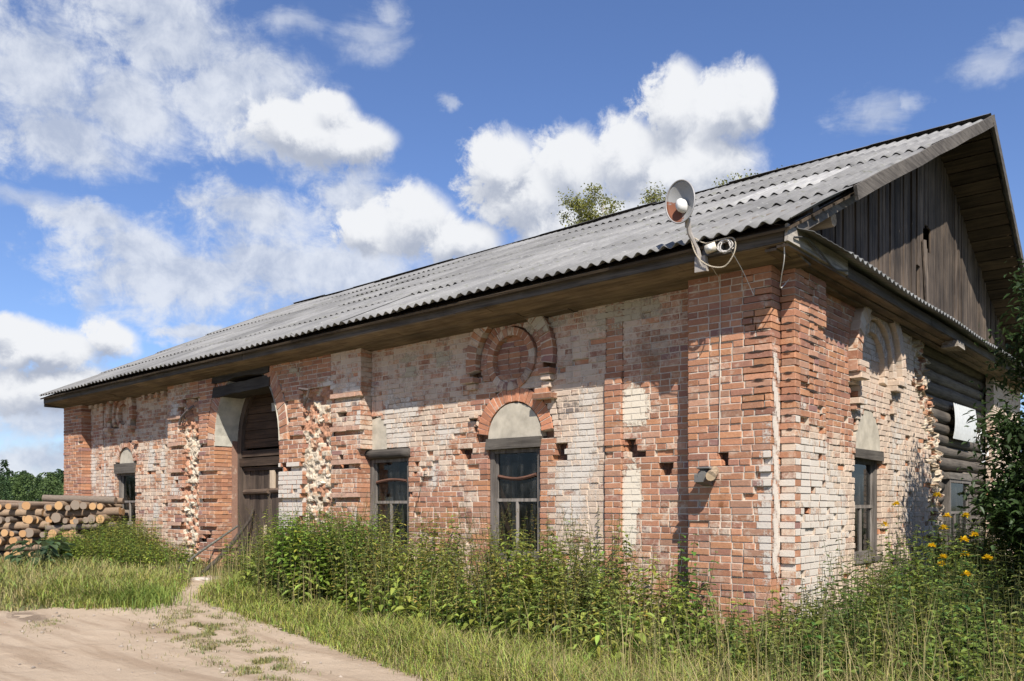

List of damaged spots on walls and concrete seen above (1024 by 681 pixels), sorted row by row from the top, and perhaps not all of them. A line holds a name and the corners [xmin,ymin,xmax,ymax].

spalling [170,398,213,567]
spalling [283,376,357,533]
spalling [907,338,946,565]